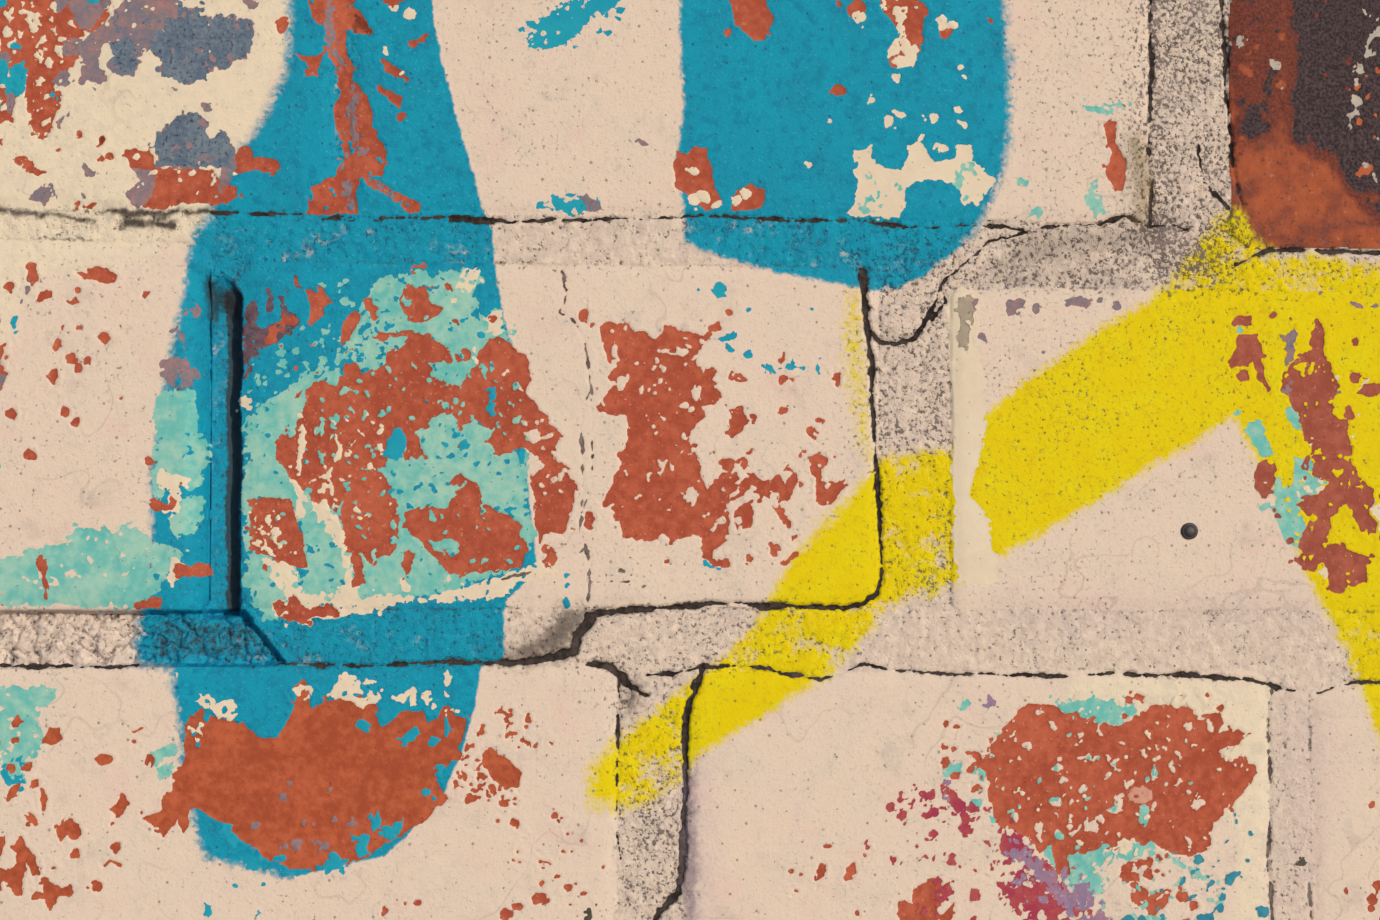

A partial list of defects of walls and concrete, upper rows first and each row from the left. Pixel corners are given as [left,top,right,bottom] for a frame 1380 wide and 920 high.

peeling [0,0,280,210]
peeling [673,146,765,211]
peeling [723,0,774,41]
peeling [836,0,958,83]
peeling [847,106,996,221]
peeling [236,262,848,628]
crack [210,0,1296,920]
peeling [1228,311,1380,594]
peeling [0,670,553,911]
peeling [788,844,832,892]
peeling [886,691,1257,920]
crack [1317,680,1380,694]